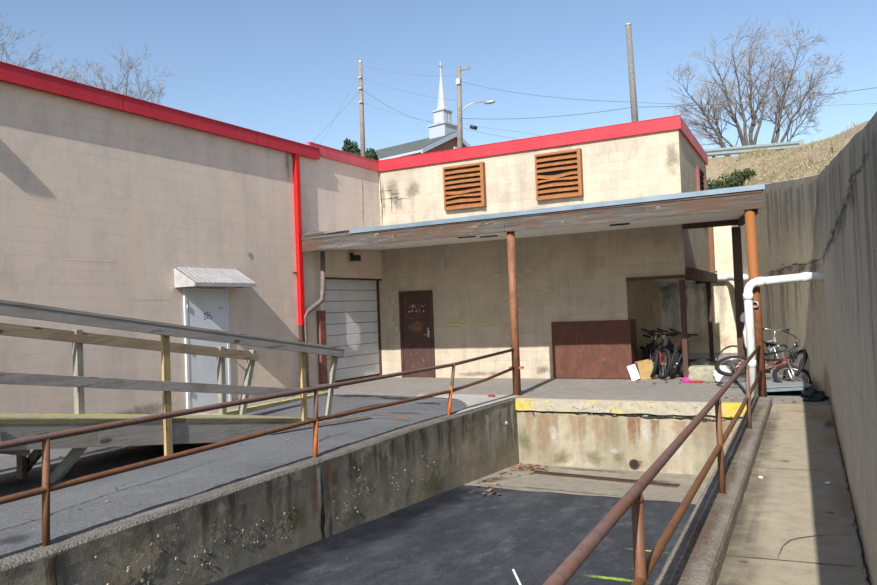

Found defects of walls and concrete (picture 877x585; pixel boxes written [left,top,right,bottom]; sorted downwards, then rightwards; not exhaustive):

crack [768,148,869,276]
crack [313,464,331,539]
spalling [107,504,298,585]